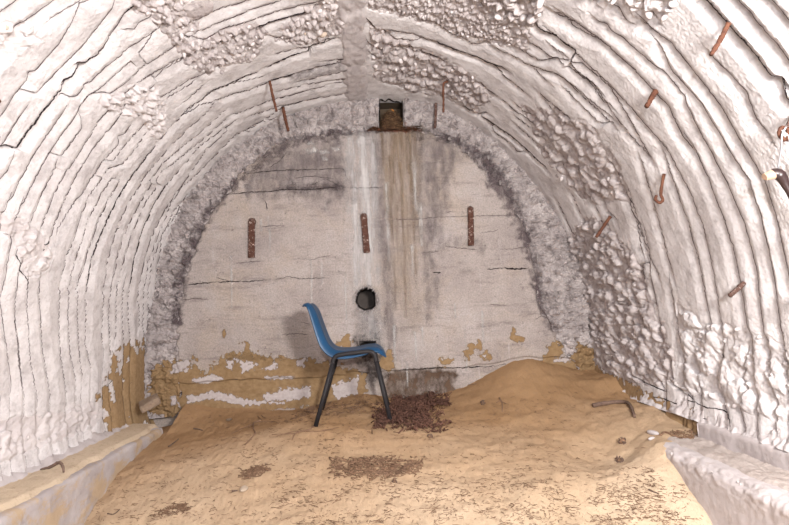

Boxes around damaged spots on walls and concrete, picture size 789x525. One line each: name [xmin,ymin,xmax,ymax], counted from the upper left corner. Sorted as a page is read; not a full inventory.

crack [227,156,381,227]
leakage [427,132,537,263]
spalling [144,98,380,419]
crack [392,211,528,270]
leakage [531,274,544,313]